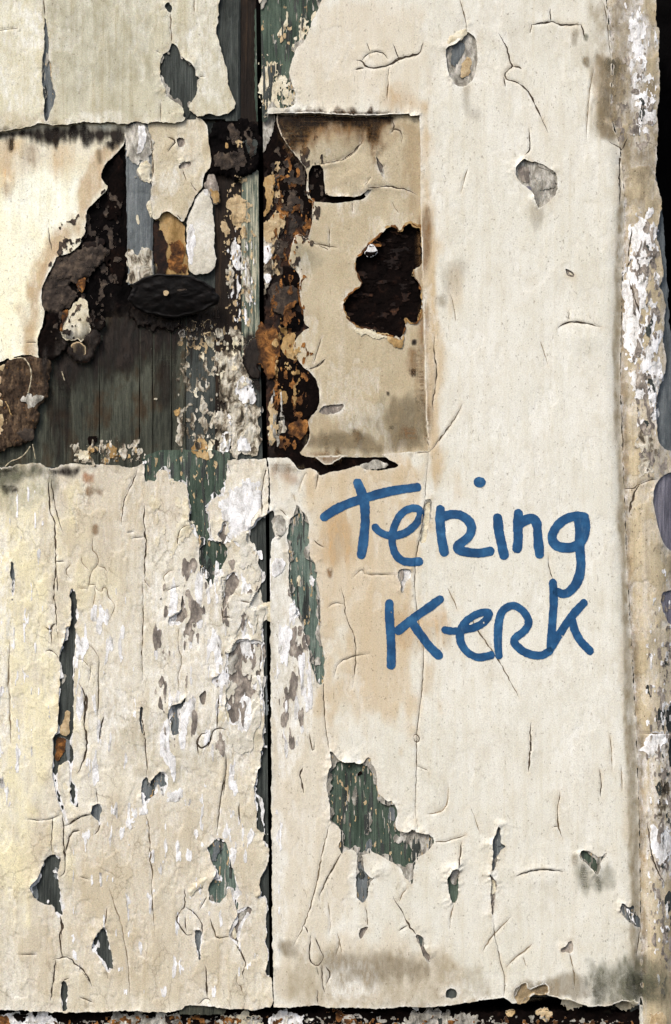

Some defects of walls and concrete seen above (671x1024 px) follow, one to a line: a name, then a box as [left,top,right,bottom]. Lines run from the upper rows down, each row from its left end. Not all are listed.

peeling [160,44,199,119]
peeling [446,29,478,87]
crack [500,36,548,154]
rust [153,212,189,275]
rust [242,117,327,468]
peeling [620,207,671,550]
crack [46,480,115,772]
peeling [30,161,404,977]
crack [32,792,100,879]
peeling [327,751,434,903]
crack [22,893,130,1002]
crack [297,824,342,1003]